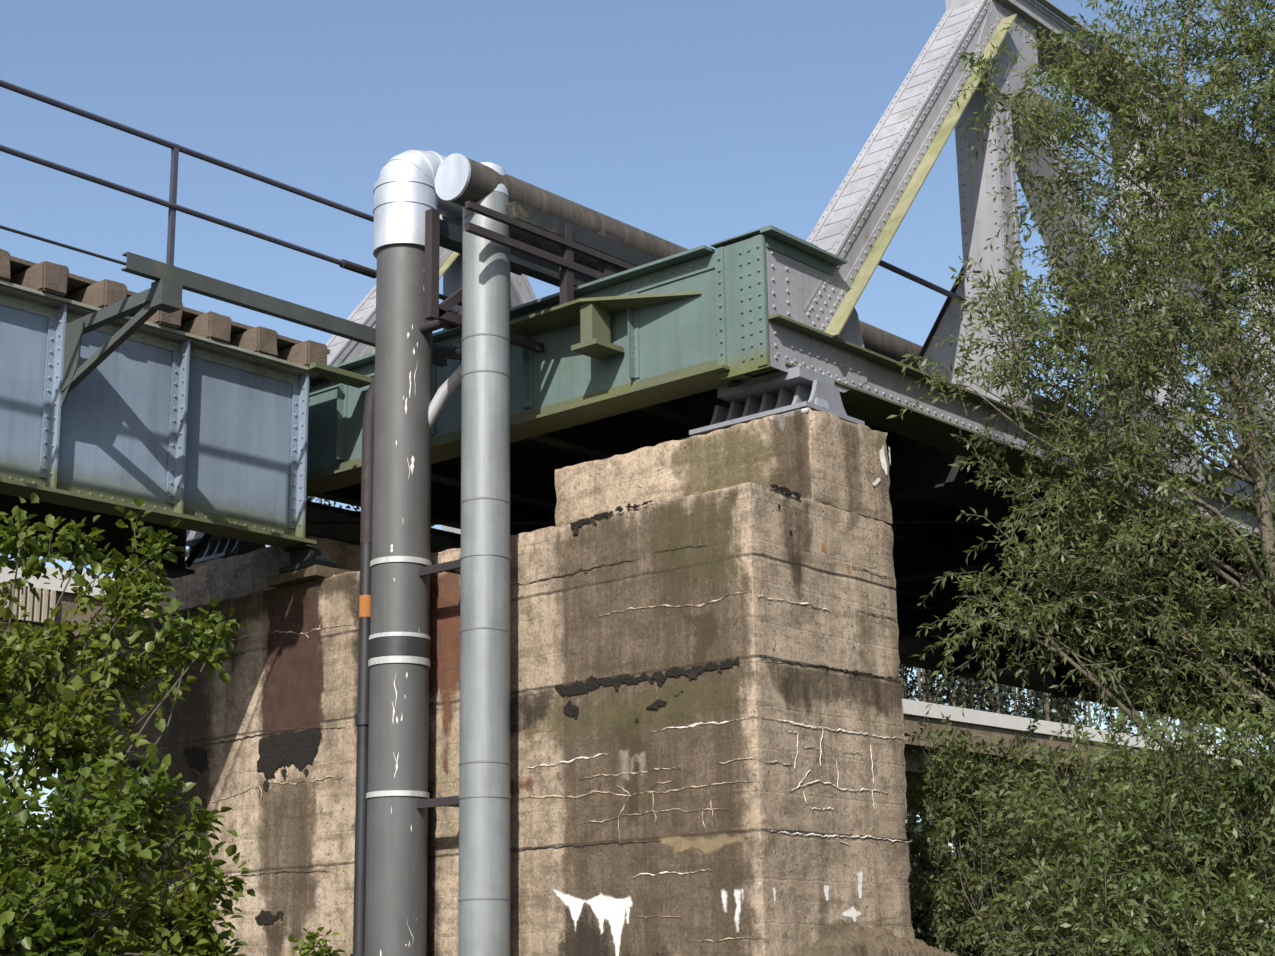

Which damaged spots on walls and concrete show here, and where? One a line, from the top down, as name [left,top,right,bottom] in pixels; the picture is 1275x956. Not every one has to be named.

spalling [570,500,653,536]
water stain [769,407,812,586]
water stain [872,446,891,486]
crack [596,590,828,617]
spalling [555,657,740,722]
water stain [510,492,776,956]
water stain [64,573,360,956]
peeling [257,728,321,791]
crack [510,715,913,851]
water stain [426,737,439,956]
crack [632,869,709,878]